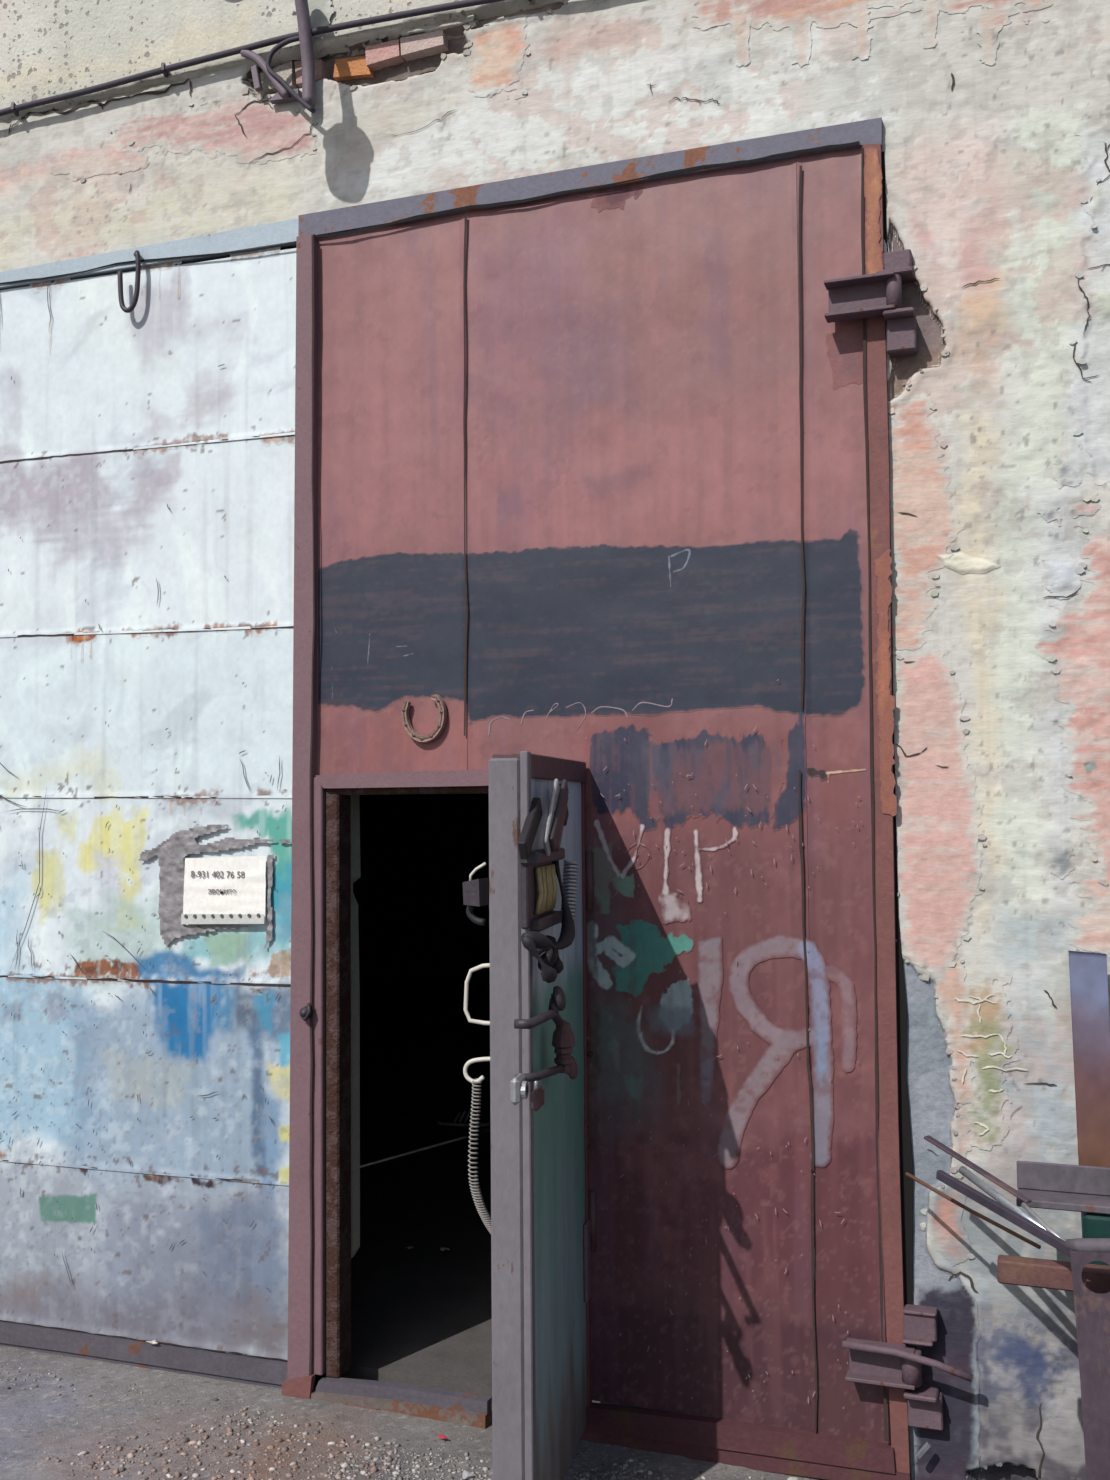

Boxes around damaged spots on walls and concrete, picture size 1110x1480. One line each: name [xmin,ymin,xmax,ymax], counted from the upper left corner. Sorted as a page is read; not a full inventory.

peeling [46,0,569,183]
rust [864,148,883,274]
spalling [887,218,904,252]
crack [1090,142,1110,201]
crack [1073,264,1110,382]
rust [121,621,184,641]
rust [203,618,280,637]
rust [873,549,897,816]
peeling [1034,125,1110,1022]
peeling [888,266,1001,1305]
rust [2,955,151,992]
spalling [966,1402,1038,1480]